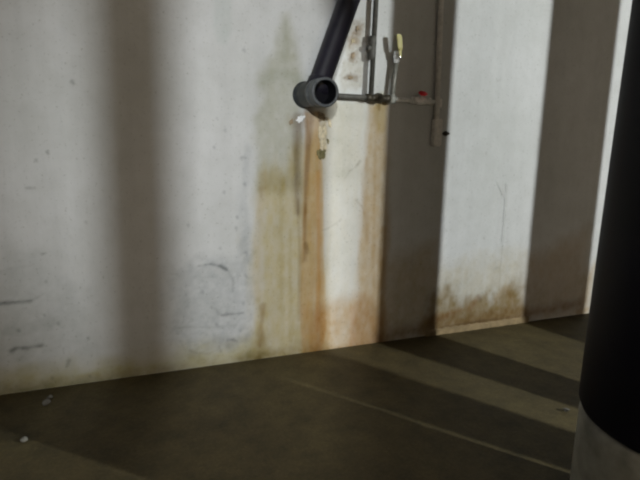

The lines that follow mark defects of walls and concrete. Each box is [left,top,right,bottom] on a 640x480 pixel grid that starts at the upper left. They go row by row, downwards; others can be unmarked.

damp [209,7,310,365]
corrosion [289,88,395,353]
damp [0,339,207,395]